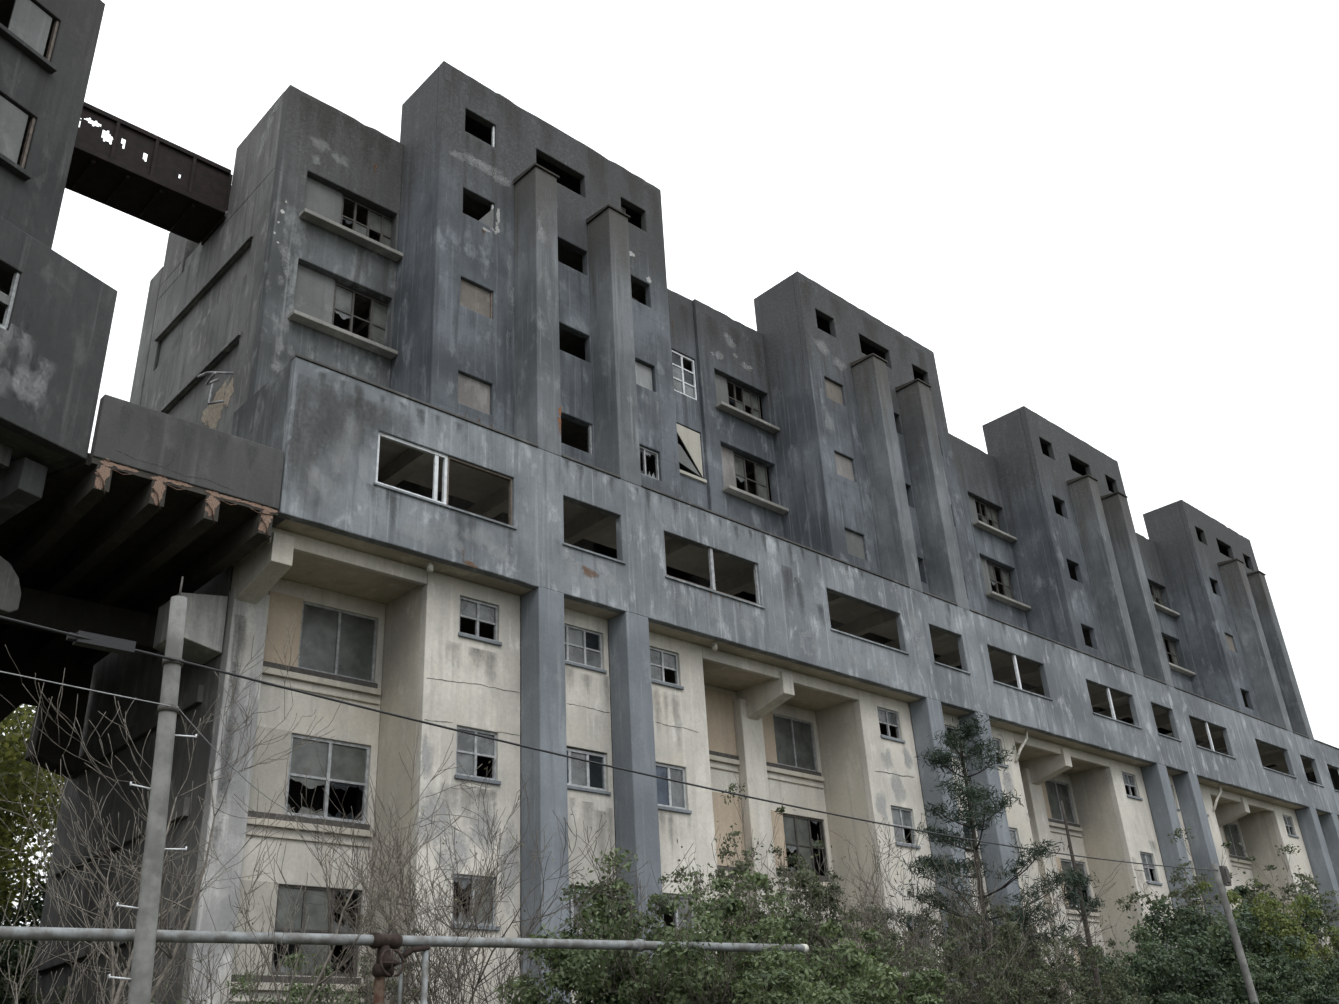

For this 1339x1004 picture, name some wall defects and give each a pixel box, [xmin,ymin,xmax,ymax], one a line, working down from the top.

spalling [94,458,278,533]